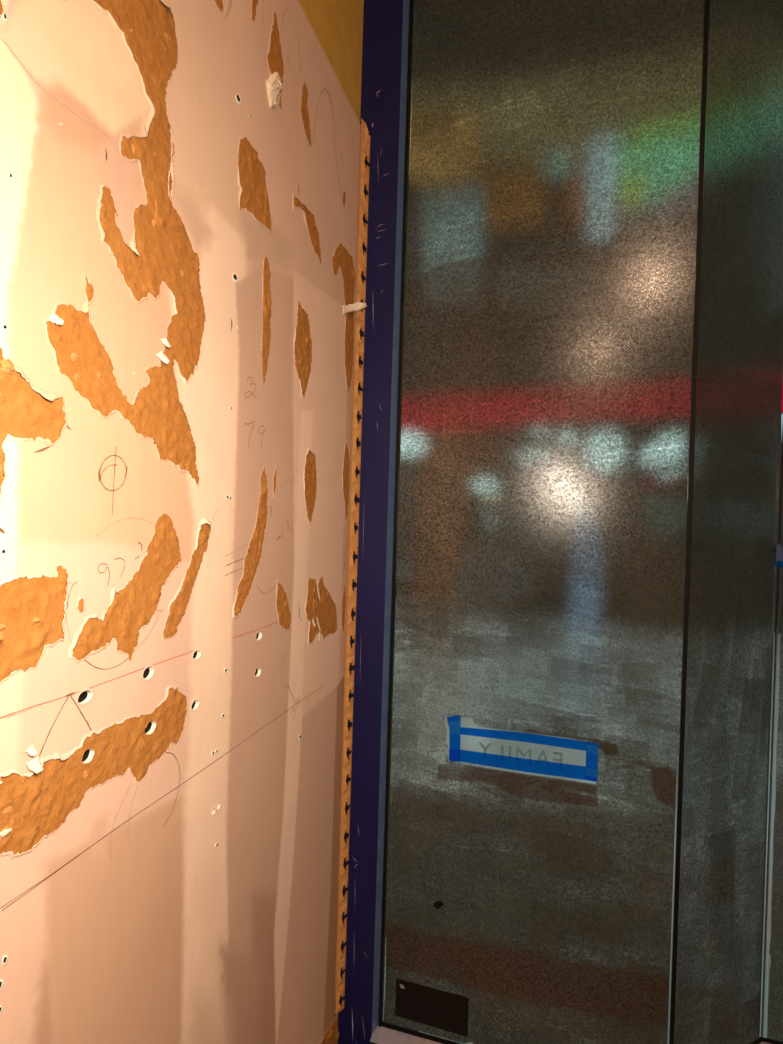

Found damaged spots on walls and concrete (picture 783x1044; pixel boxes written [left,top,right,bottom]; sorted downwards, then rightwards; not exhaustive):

peeling [266,10,284,109]
peeling [300,81,312,147]
peeling [237,136,272,234]
peeling [0,0,206,503]
peeling [292,194,356,399]
peeling [303,447,317,524]
peeling [232,463,277,619]
peeling [0,512,212,685]
peeling [275,581,292,631]
peeling [304,575,346,646]
peeling [0,685,199,859]